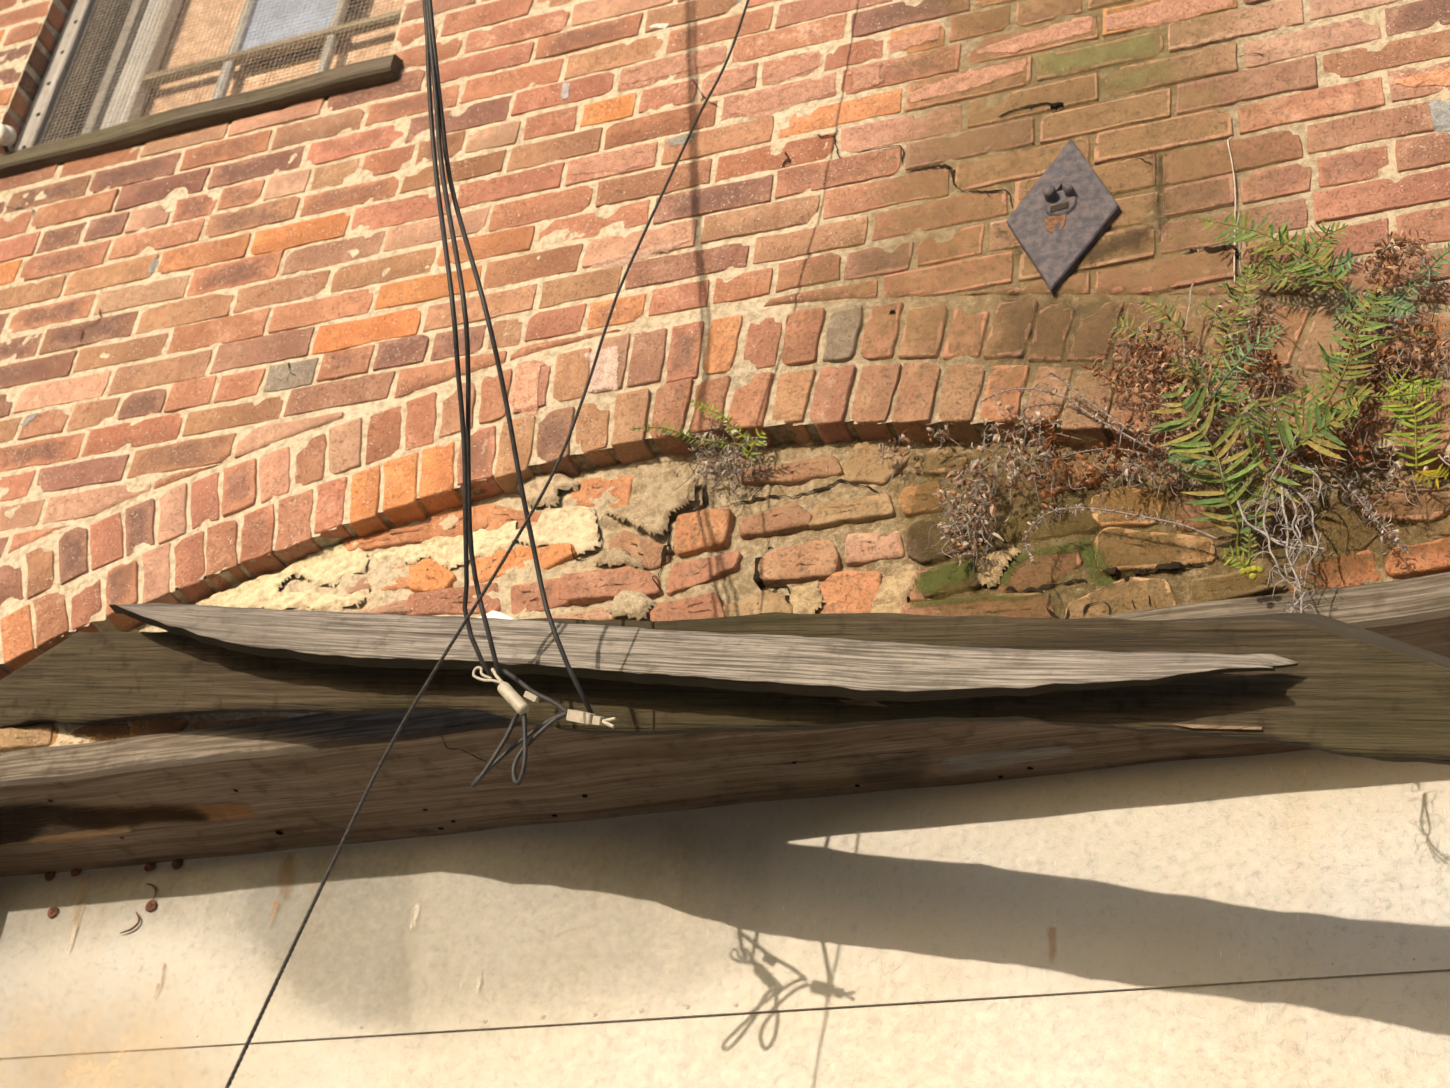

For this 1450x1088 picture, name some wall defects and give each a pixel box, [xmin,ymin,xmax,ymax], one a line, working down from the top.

crack [998,102,1063,117]
crack [1181,244,1240,259]